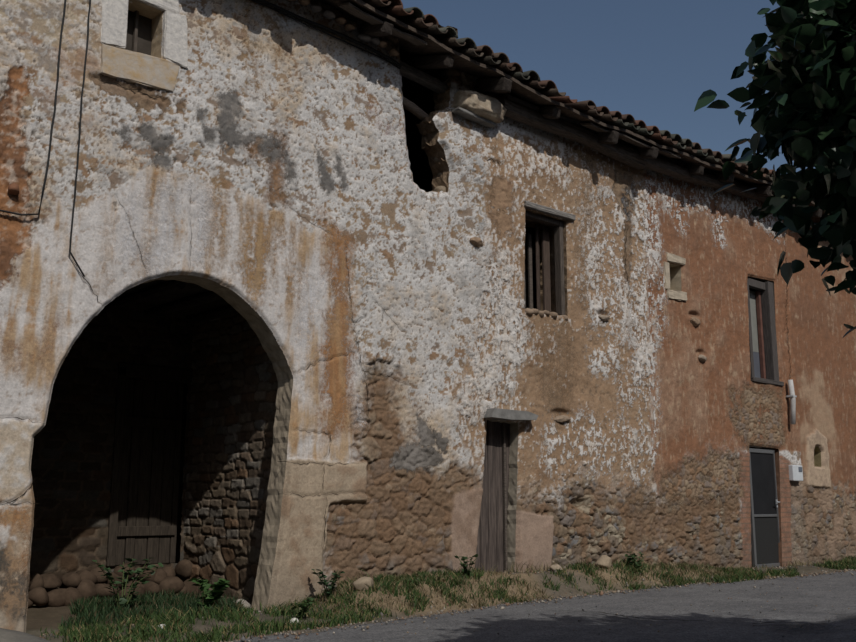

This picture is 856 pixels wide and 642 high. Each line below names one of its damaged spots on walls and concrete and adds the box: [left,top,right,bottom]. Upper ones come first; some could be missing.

flaking render [0,65,33,287]
crack [100,80,162,99]
leakage [119,123,176,168]
leakage [197,89,296,184]
flaking render [541,172,785,512]